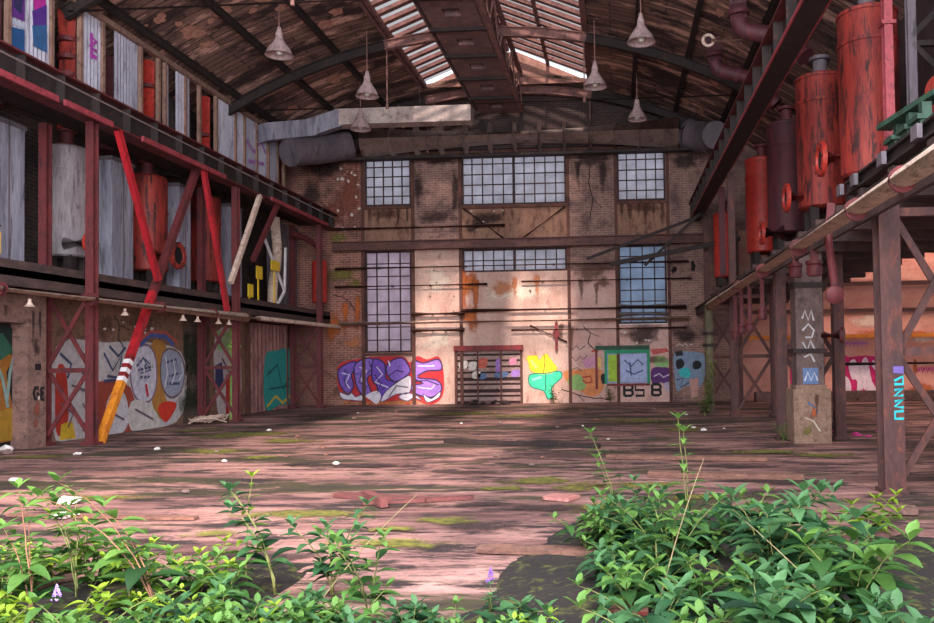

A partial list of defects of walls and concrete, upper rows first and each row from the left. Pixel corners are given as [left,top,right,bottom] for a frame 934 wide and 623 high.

corrosion [462,270,479,330]